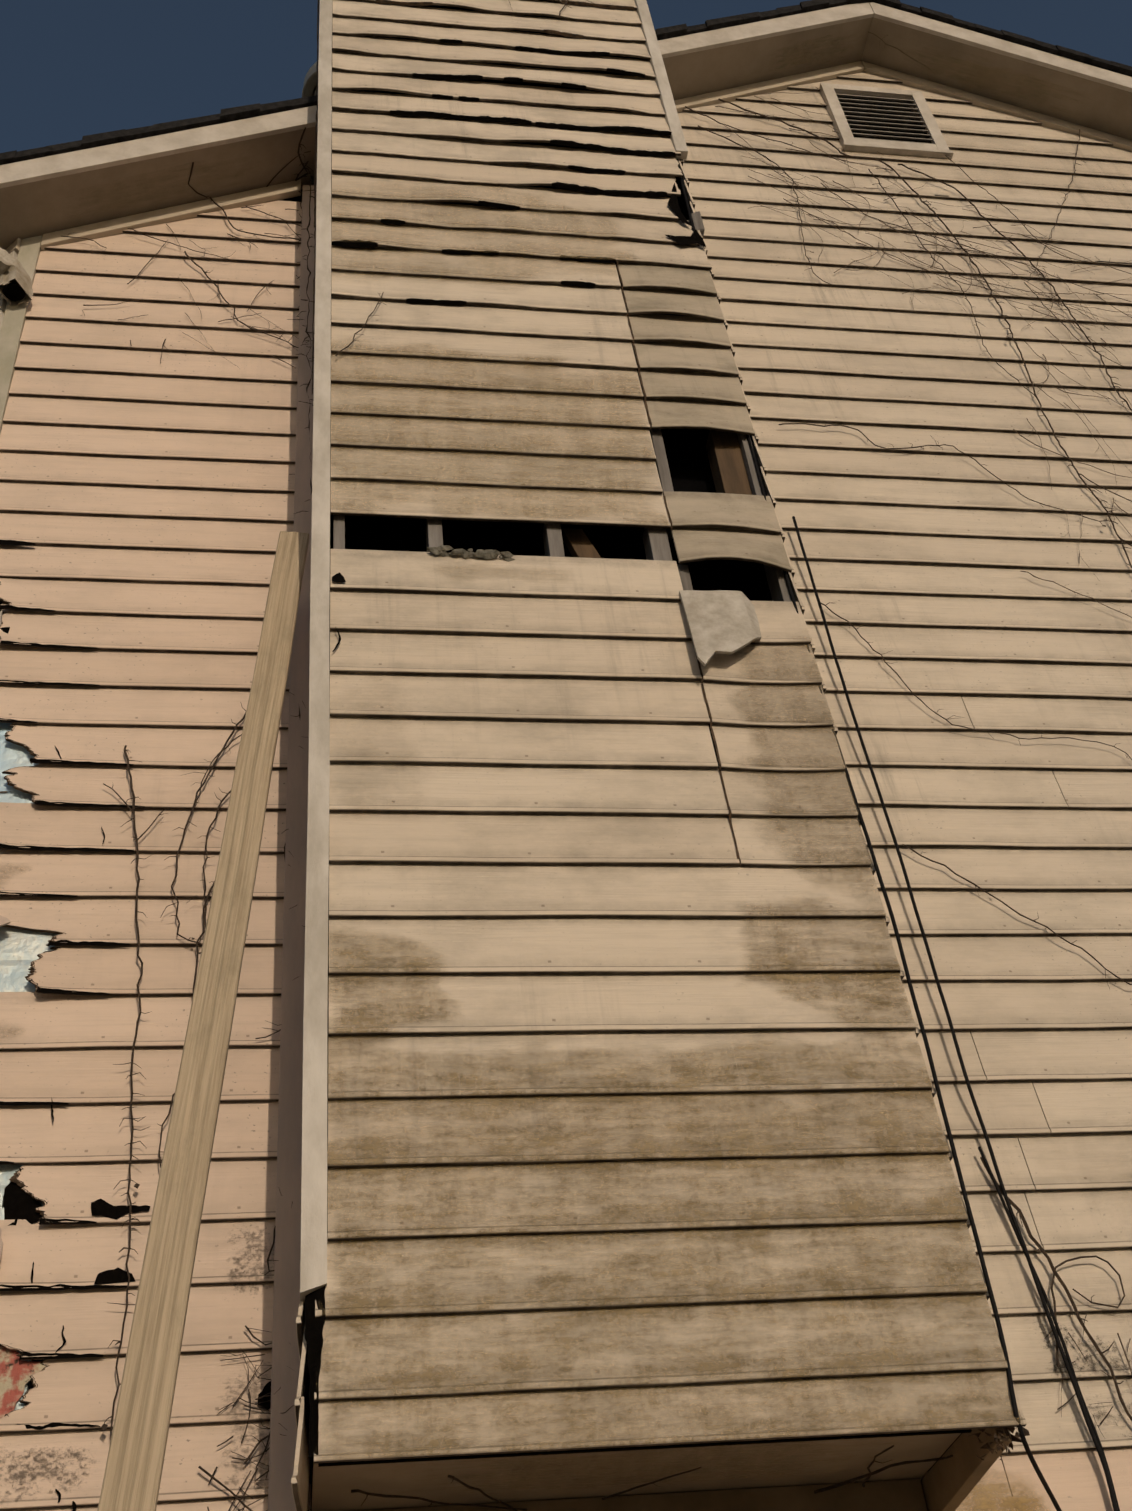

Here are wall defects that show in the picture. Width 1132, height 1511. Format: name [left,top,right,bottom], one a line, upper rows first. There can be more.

water stain [324,899,1019,1488]
peeling [0,1346,46,1418]
water stain [1045,1325,1130,1373]